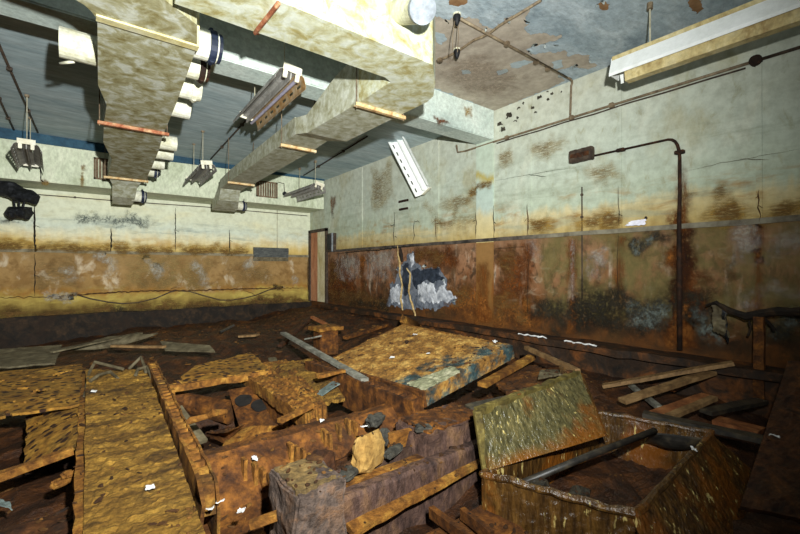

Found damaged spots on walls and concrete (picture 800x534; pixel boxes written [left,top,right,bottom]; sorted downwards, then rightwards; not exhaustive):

peeling [435,9,597,132]
water stain [531,219,553,231]
water stain [576,211,620,230]
water stain [705,188,747,227]
water stain [0,238,171,254]
water stain [184,243,247,255]
flaking render [386,246,458,316]
corrosion [415,247,459,269]
corrosion [451,245,536,328]
corrosion [667,182,708,347]
water stain [518,289,720,347]